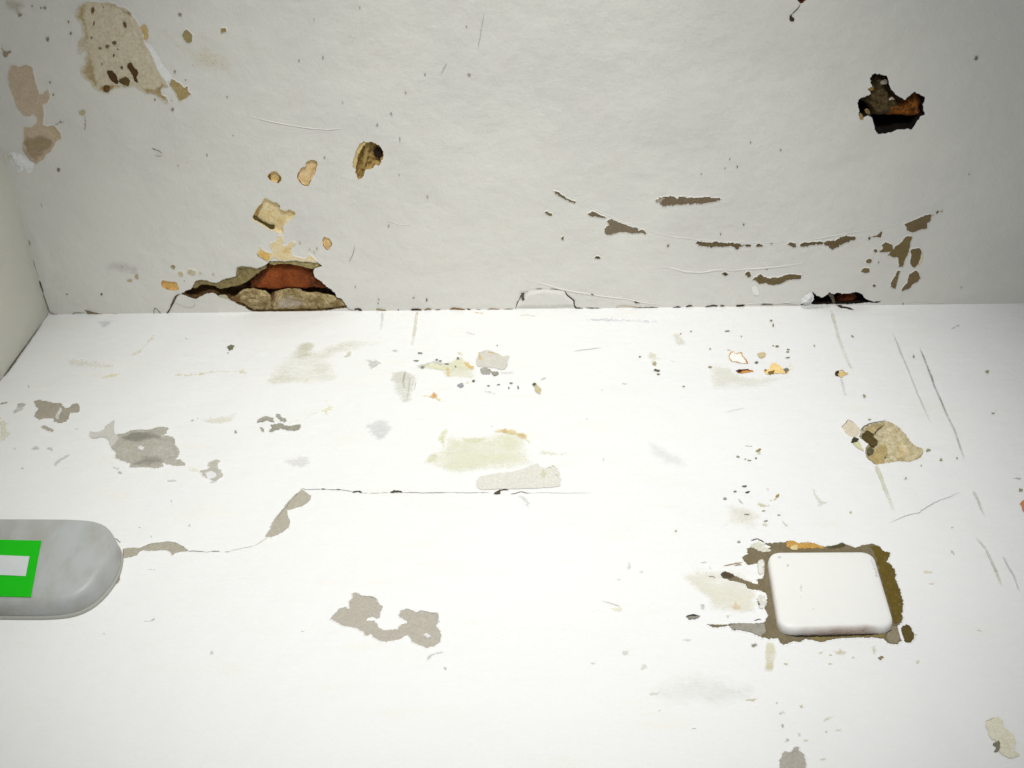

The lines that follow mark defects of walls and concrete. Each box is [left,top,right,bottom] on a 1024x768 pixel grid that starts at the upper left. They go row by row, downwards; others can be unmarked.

peeling [67,0,192,111]
peeling [7,63,63,173]
peeling [654,194,722,208]
flaking render [161,198,347,313]
peeling [694,233,773,250]
peeling [786,211,943,305]
peeling [1,399,81,432]
peeling [89,420,187,481]
flaking render [840,419,942,466]
crack [303,487,589,495]
peeling [329,592,444,650]
flaking render [705,538,917,664]